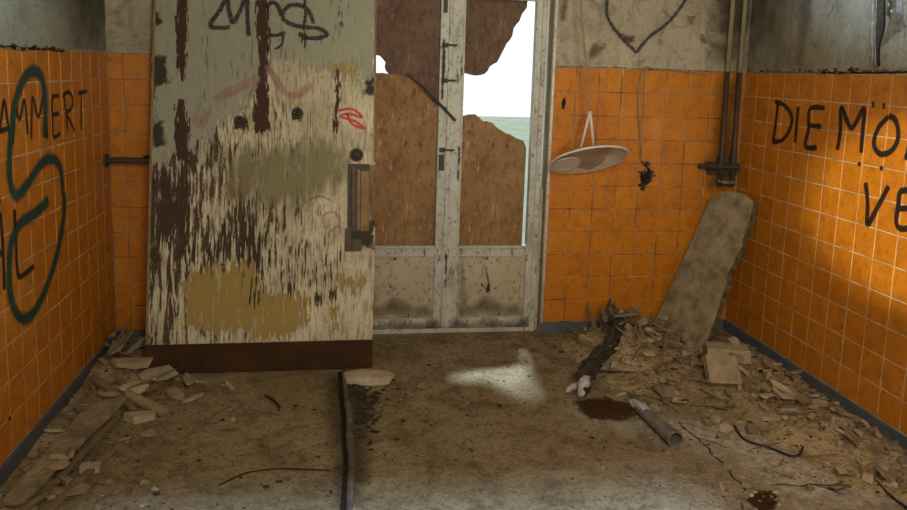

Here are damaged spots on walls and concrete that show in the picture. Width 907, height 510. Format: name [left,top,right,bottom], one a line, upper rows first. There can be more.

flaking render [0,43,65,53]
leakage [722,0,747,55]
flaking render [650,0,907,75]
crack [624,391,746,491]